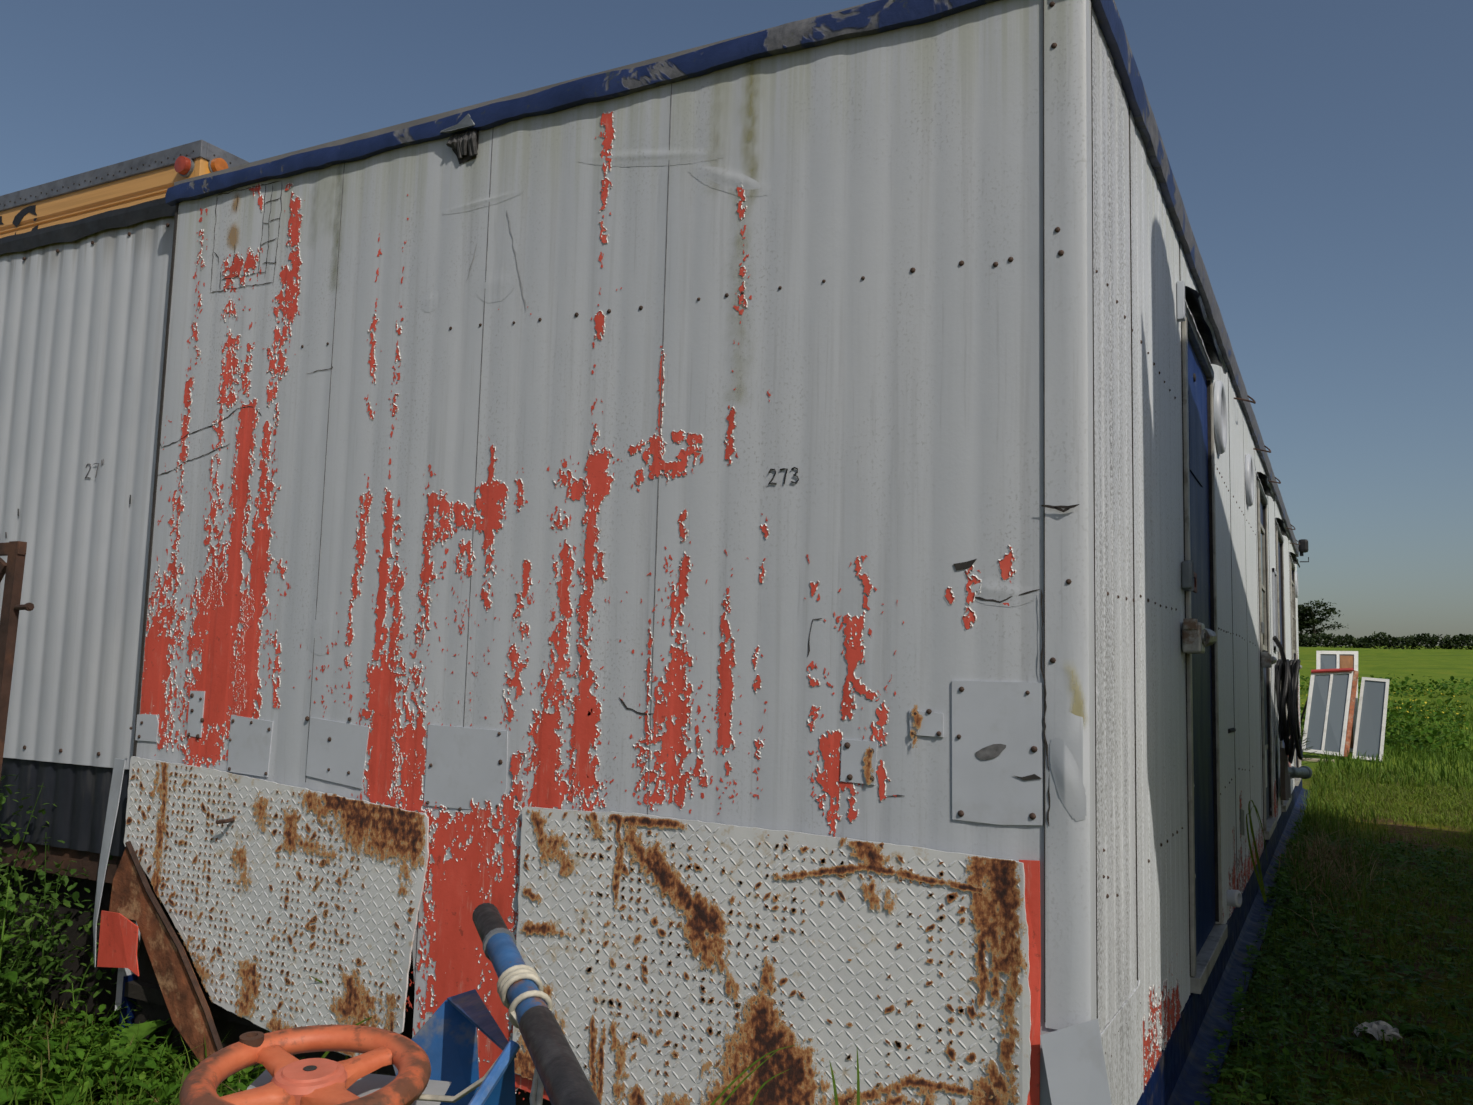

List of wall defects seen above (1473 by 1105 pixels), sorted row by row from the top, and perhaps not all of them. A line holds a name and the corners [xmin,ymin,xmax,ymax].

peeling [595,111,616,268]
peeling [140,182,767,1079]
peeling [804,554,820,601]
peeling [807,555,898,837]
peeling [944,559,982,630]
peeling [997,545,1017,584]
rust [126,762,426,1032]
rust [514,1030,535,1081]
rust [519,809,1028,1105]
peeling [1143,964,1181,1092]
peeling [1222,760,1301,924]